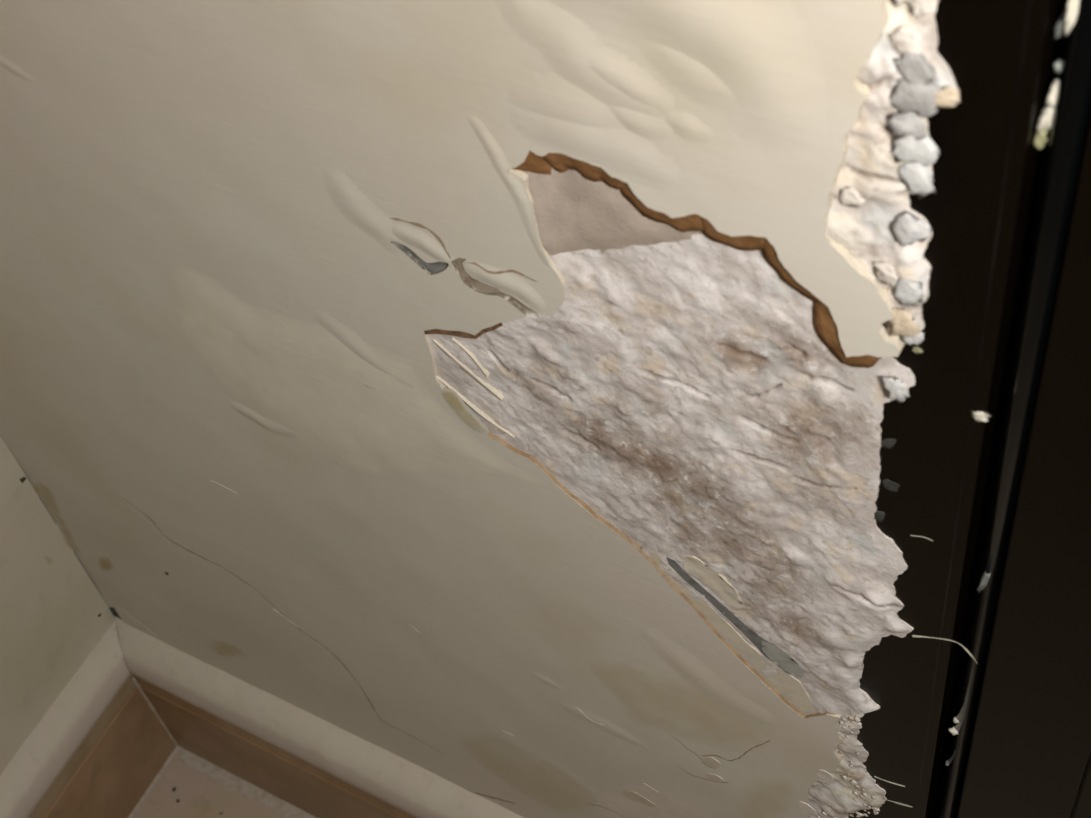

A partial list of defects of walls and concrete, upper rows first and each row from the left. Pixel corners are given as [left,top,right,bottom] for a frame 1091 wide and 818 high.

flaking render [826,0,961,345]
flaking render [427,151,916,818]
crack [671,735,771,783]